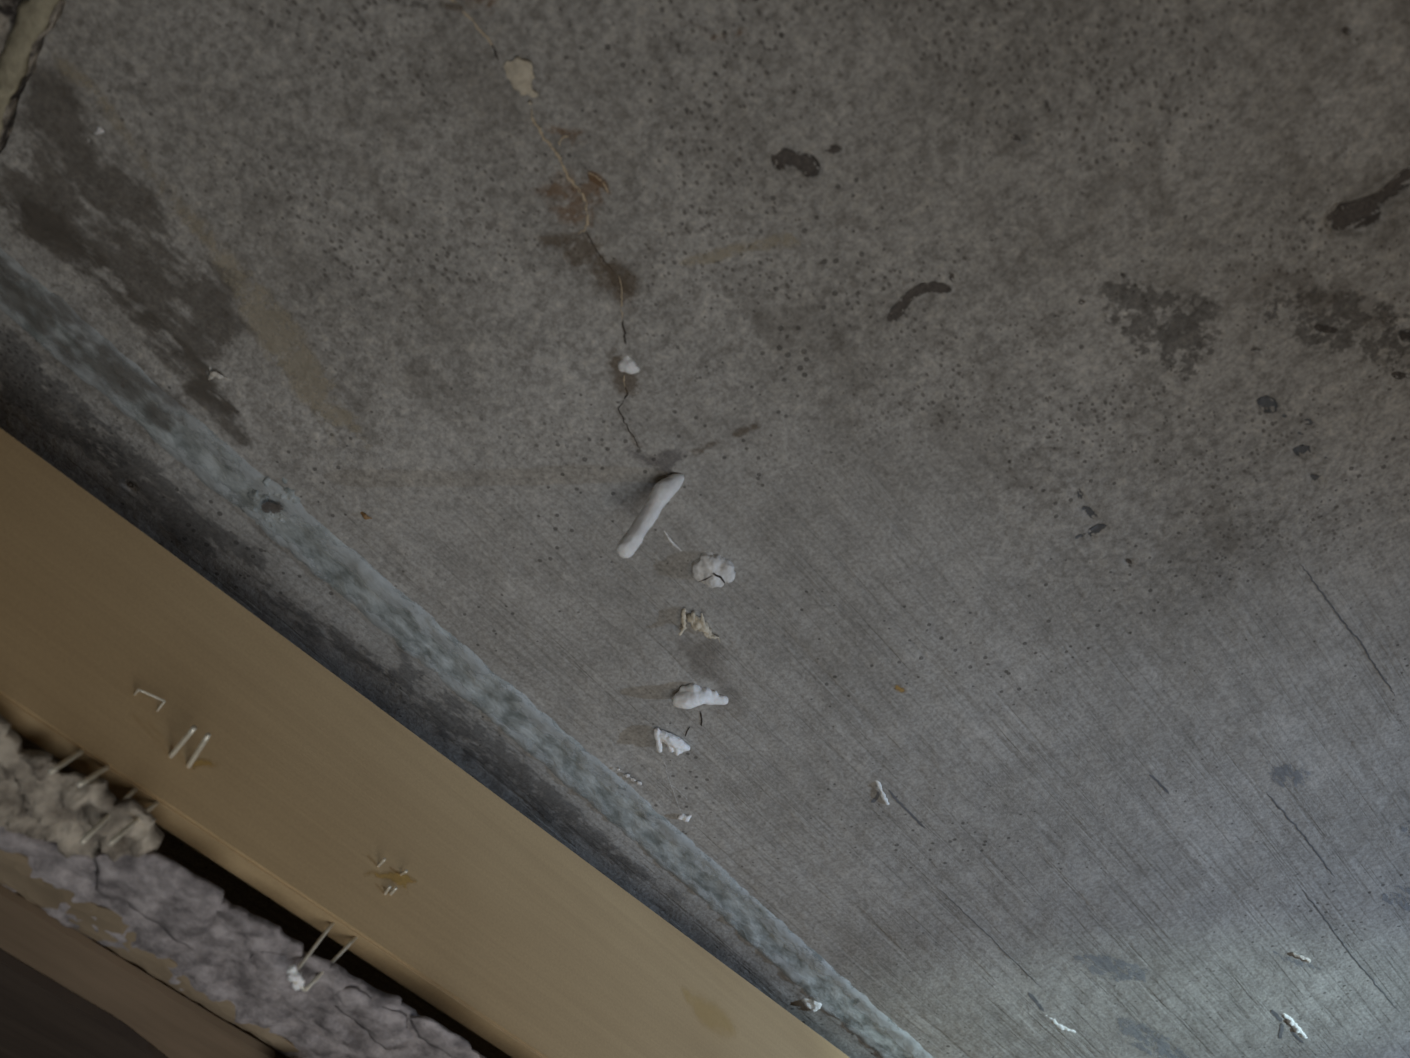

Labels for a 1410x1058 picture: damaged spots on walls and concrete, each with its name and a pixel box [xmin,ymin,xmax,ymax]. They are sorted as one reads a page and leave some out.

crack [531,109,641,450]